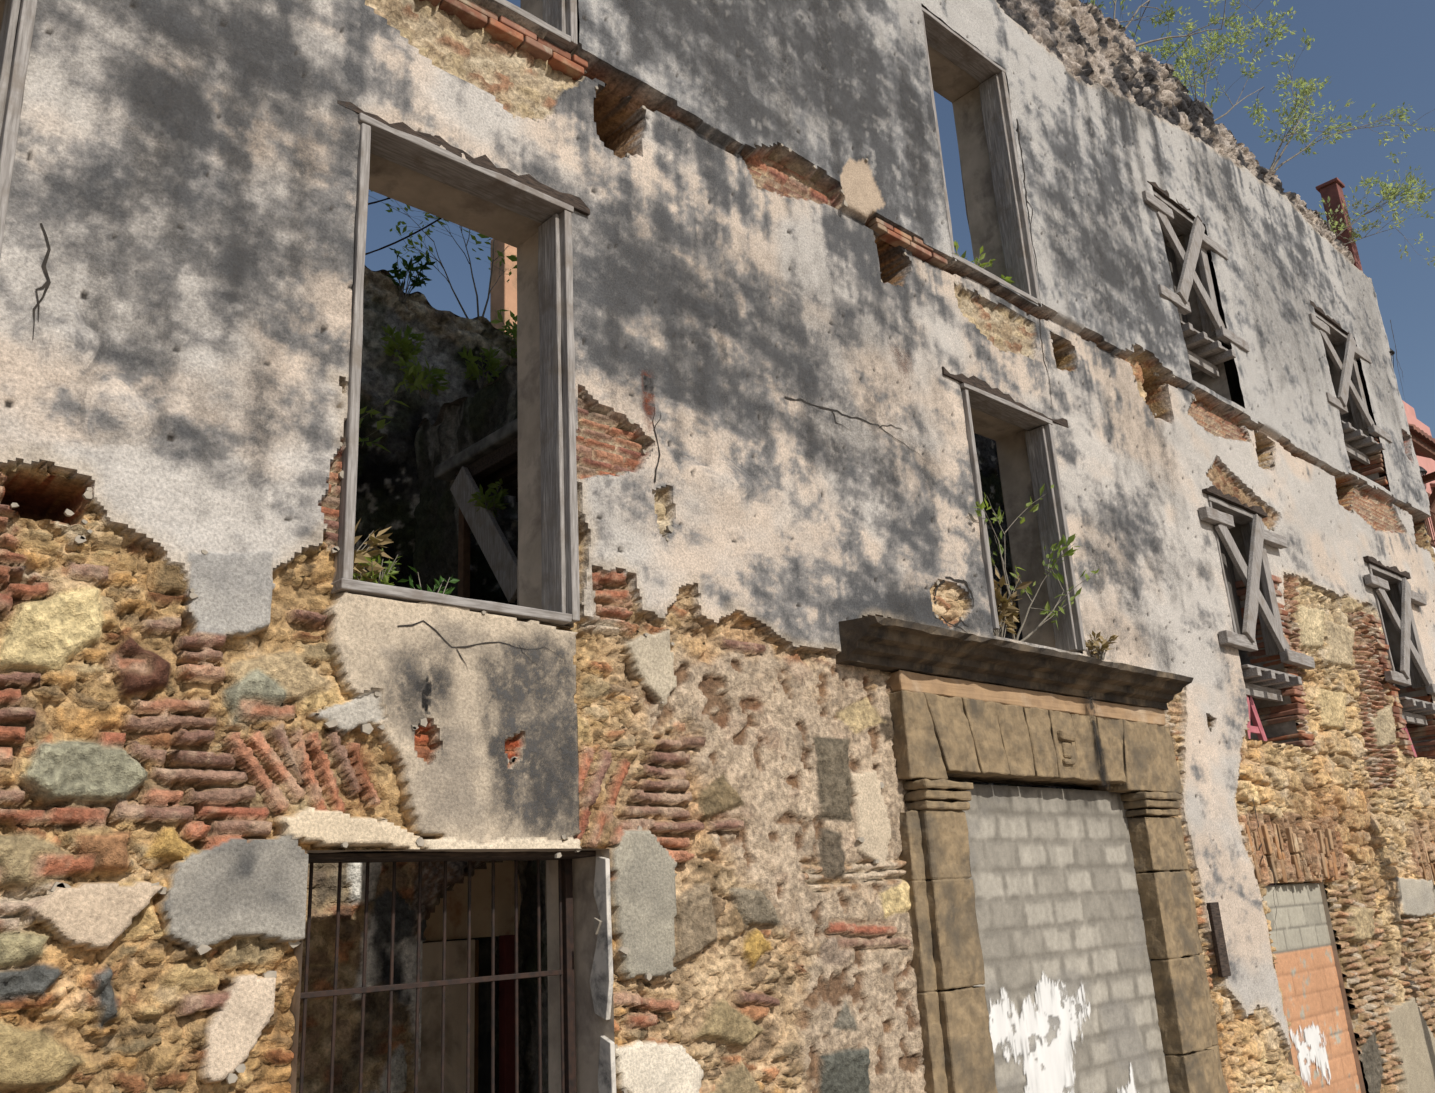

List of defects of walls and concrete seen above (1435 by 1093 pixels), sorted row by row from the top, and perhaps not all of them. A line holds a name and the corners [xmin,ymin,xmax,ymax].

spalling [365,0,647,160]
spalling [742,141,913,288]
crack [33,223,51,337]
spalling [954,281,1079,373]
spalling [576,384,655,481]
crack [785,396,926,461]
spalling [1123,343,1281,531]
spalling [0,468,95,552]
peeling [182,549,275,639]
crack [397,620,565,669]
peeling [23,591,704,1093]
peeling [989,973,1091,1093]